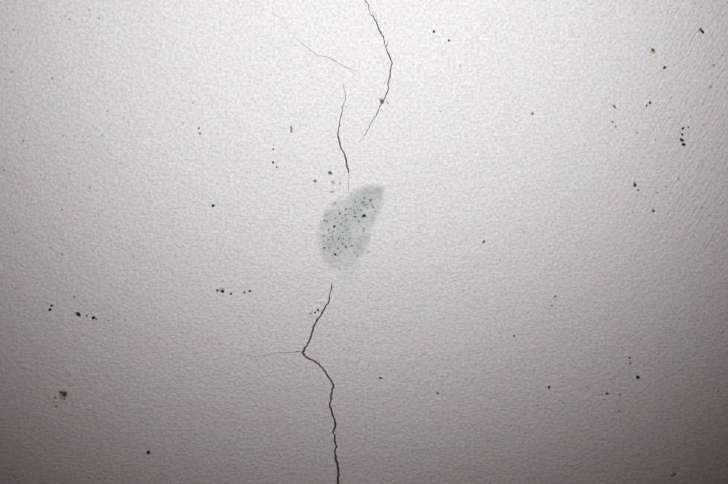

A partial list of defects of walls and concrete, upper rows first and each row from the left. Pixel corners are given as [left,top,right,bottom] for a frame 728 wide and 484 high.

crack [337,86,349,190]
crack [360,0,393,142]
crack [242,284,340,484]